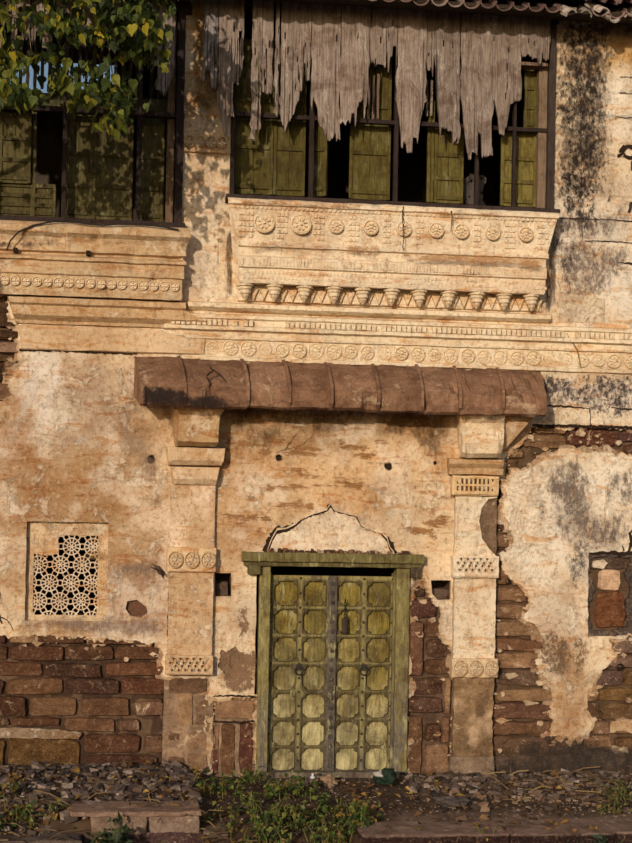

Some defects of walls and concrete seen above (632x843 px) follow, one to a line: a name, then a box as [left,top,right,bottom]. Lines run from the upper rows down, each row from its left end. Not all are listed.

damp [547,21,632,308]
crack [617,145,632,160]
flaking render [0,296,21,402]
crack [206,365,227,388]
damp [543,375,632,418]
damp [549,462,624,586]
damp [607,474,632,506]
spalling [126,600,147,617]
flaking render [479,424,632,773]
flaking render [0,634,257,776]
flaking render [407,578,453,774]